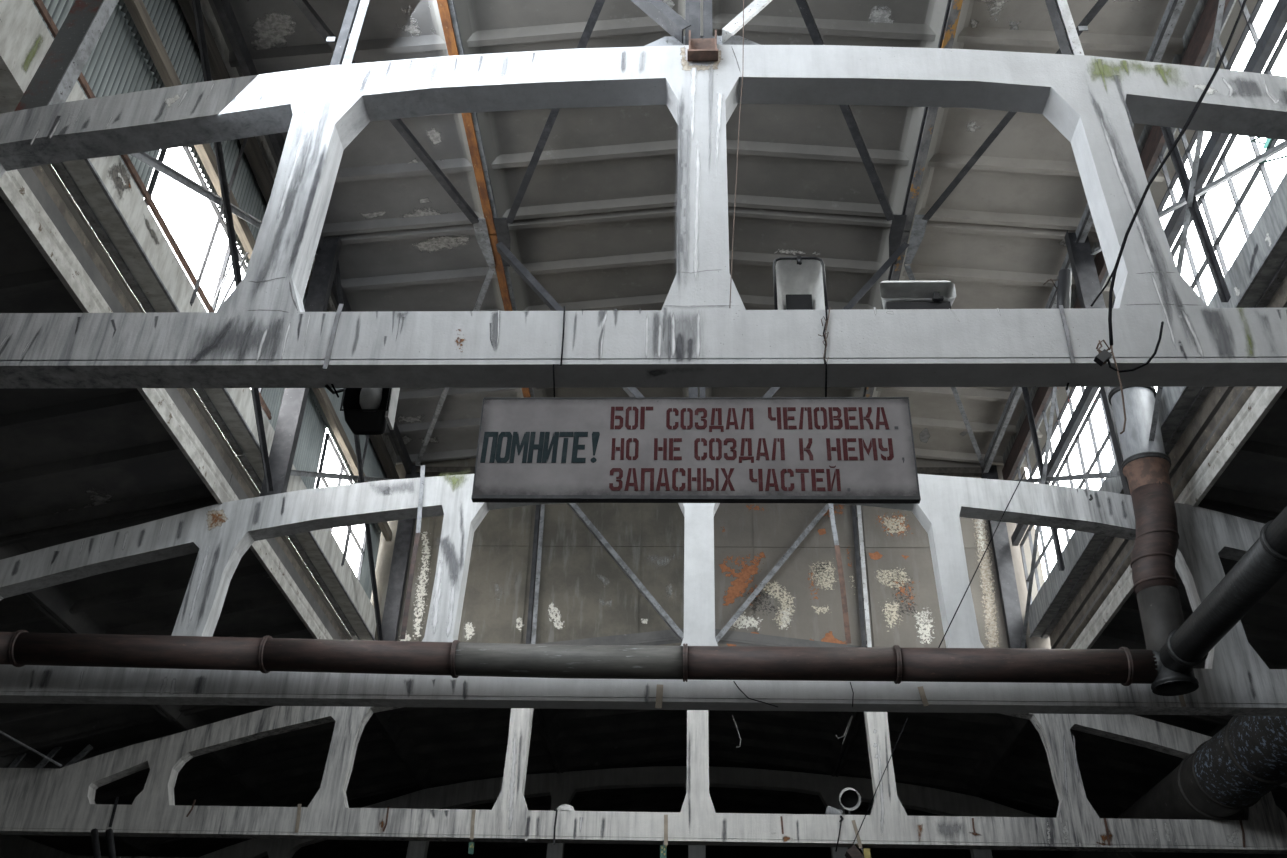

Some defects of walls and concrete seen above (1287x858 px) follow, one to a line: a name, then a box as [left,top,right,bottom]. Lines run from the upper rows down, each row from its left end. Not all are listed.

rust [206,509,227,531]